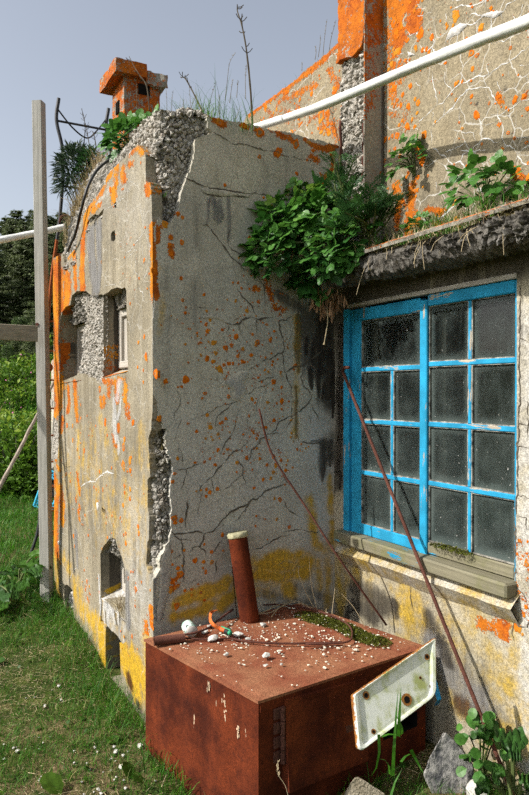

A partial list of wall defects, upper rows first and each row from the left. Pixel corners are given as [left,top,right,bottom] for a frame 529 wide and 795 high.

spalling [129,109,208,223]
crack [185,177,295,201]
spalling [338,49,364,244]
crack [378,73,386,198]
crack [400,0,529,219]
crack [102,182,174,339]
spalling [68,289,126,384]
crack [172,224,329,582]
water stain [295,314,344,490]
spalling [149,429,171,571]
water stain [98,570,130,630]